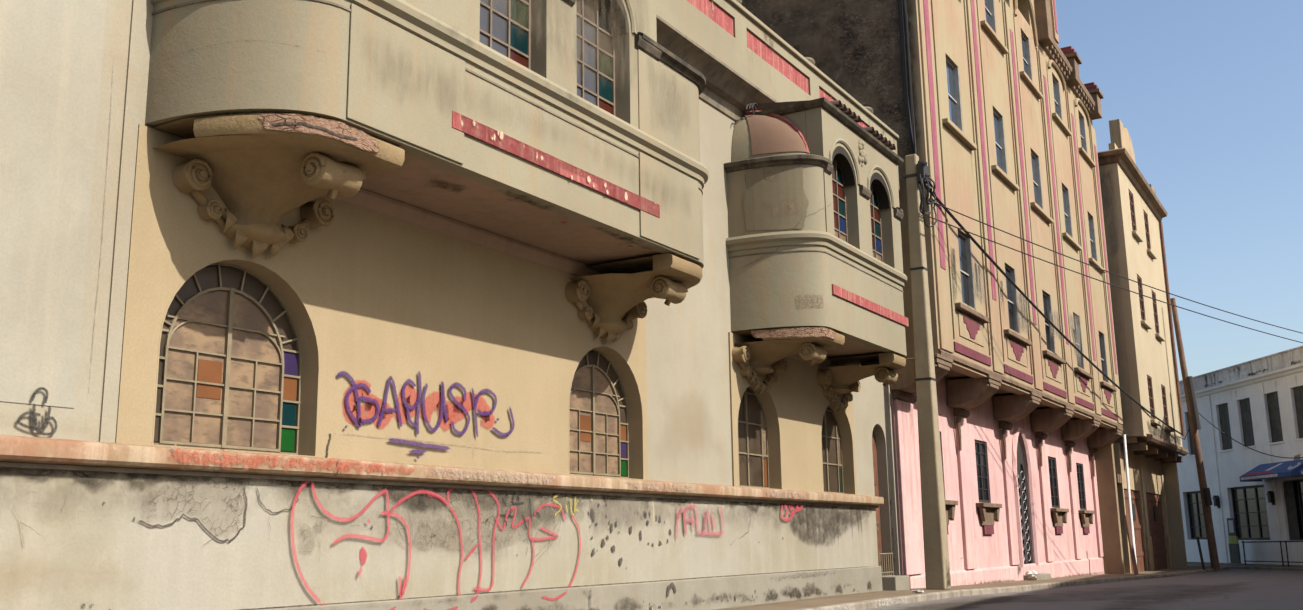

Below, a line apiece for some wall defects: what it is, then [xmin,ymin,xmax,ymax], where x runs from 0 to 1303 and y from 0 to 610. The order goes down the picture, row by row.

peeling [741,0,917,156]
water stain [275,476,621,523]
water stain [638,494,692,524]
water stain [726,499,871,544]